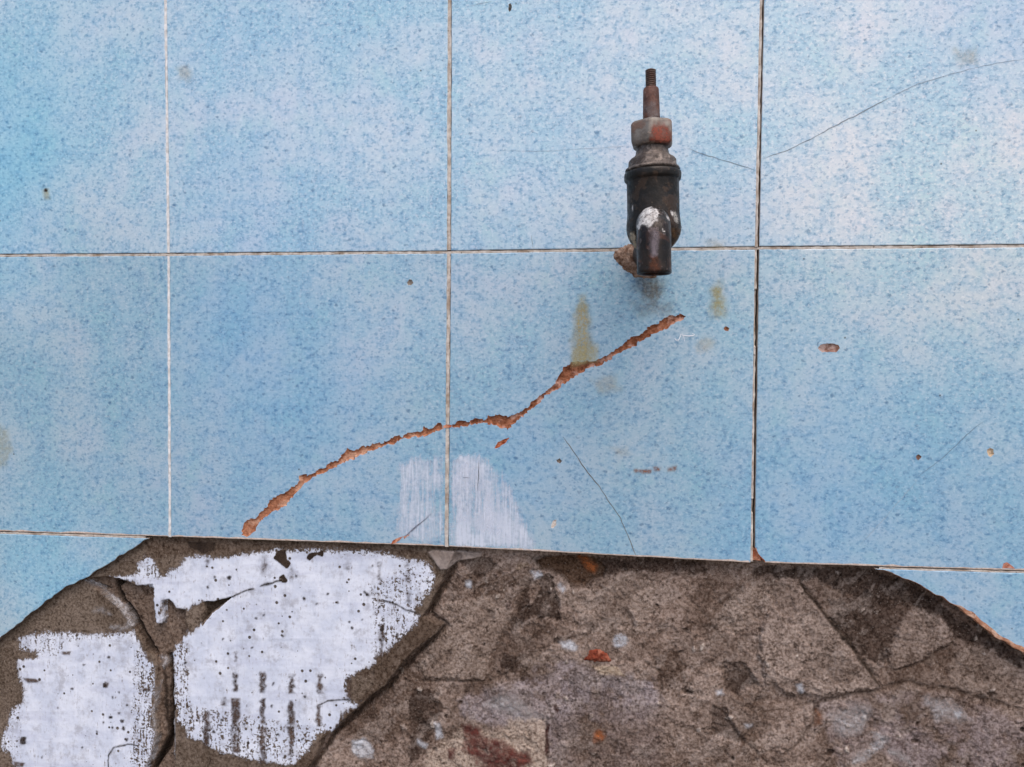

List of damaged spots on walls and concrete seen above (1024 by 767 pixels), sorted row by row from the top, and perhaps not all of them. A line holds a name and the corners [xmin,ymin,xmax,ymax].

rust [650,126,670,143]
spalling [818,343,840,352]
crack [242,313,686,537]
crack [391,518,427,544]
crack [563,437,637,558]
peeling [1,630,156,767]
crack [118,579,175,761]
peeling [110,542,482,766]
crack [335,634,437,733]
crack [545,706,558,754]
crack [801,584,880,686]